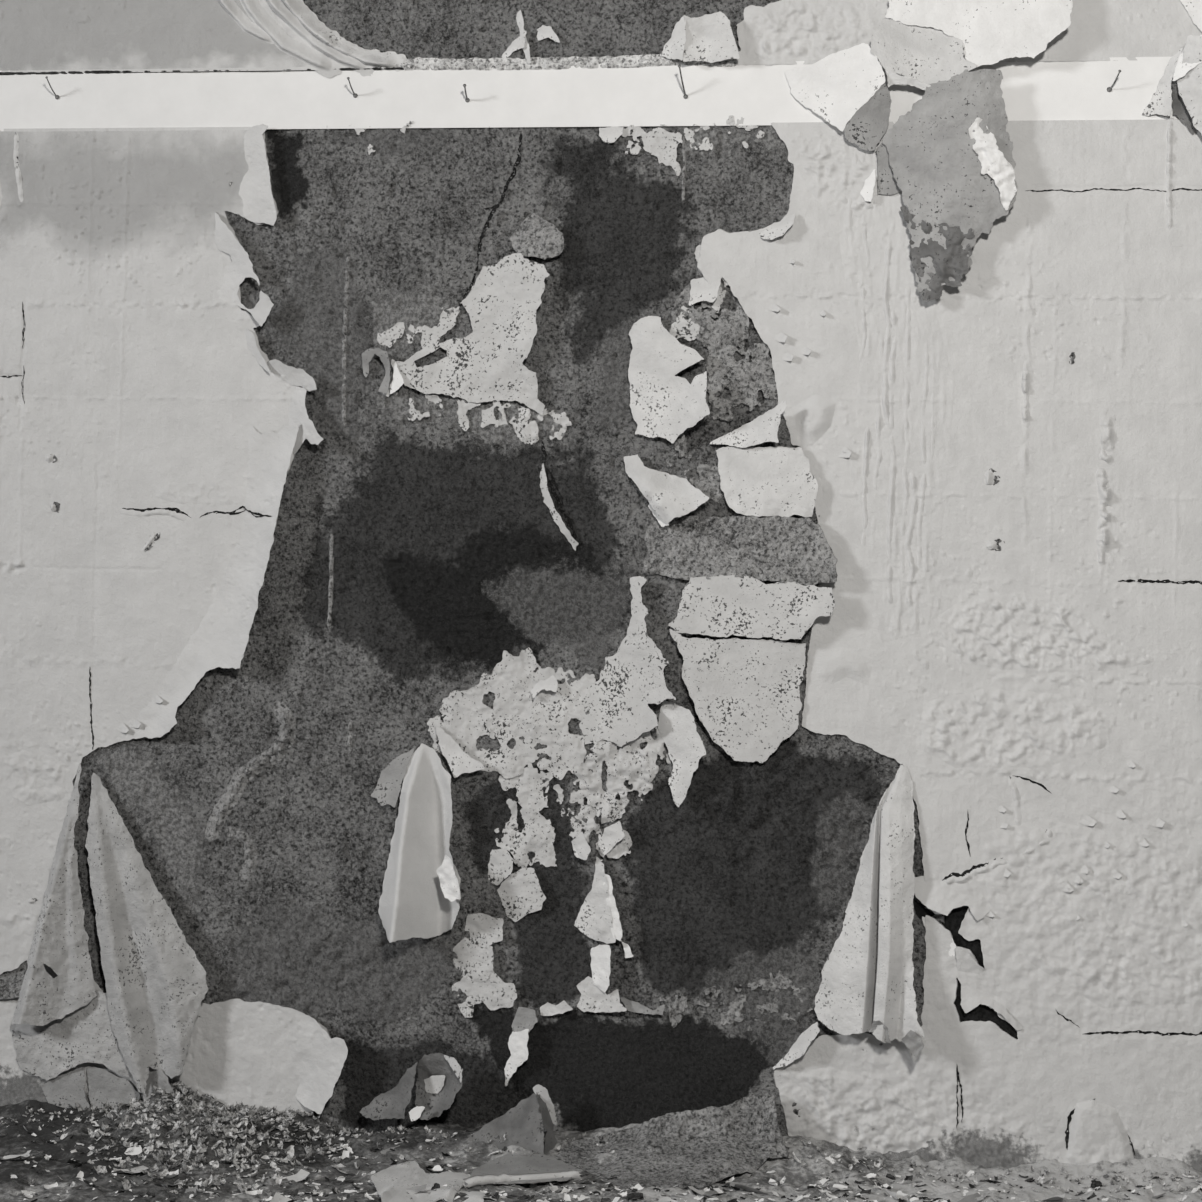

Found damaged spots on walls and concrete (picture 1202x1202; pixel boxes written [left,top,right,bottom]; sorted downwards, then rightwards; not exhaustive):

peeling [303,0,780,64]
peeling [1142,0,1202,135]
peeling [785,0,1073,302]
crack [1027,186,1202,194]
crack [2,302,25,404]
peeling [983,468,1000,485]
crack [119,506,270,521]
peeling [986,539,1005,551]
crack [1118,577,1202,585]
peeling [12,115,995,1136]
crack [1056,1010,1202,1036]